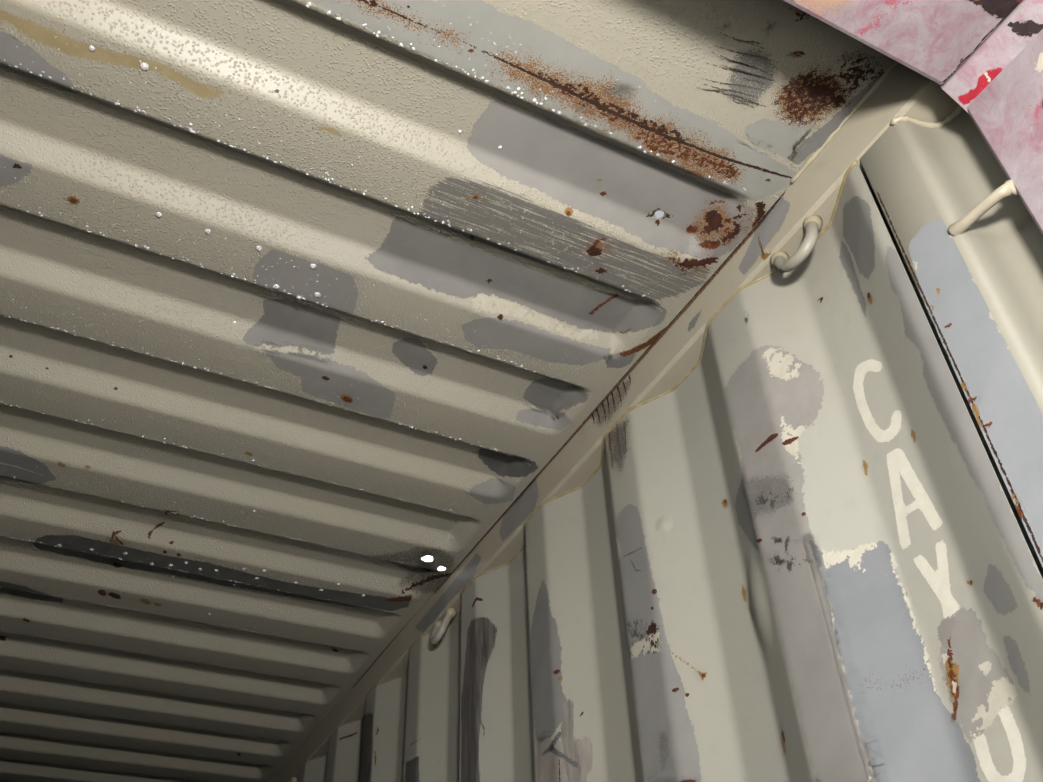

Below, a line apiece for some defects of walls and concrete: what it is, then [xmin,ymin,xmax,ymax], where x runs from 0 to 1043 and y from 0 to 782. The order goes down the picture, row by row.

peeling [795,0,862,18]
peeling [854,0,918,38]
corrosion [767,37,887,135]
peeling [952,67,1002,105]
peeling [1034,52,1043,85]
corrosion [337,0,792,687]
spalling [762,347,801,381]
peeling [820,542,877,573]
peeling [890,551,960,693]
corrosion [941,637,960,725]
peeling [970,661,1017,736]